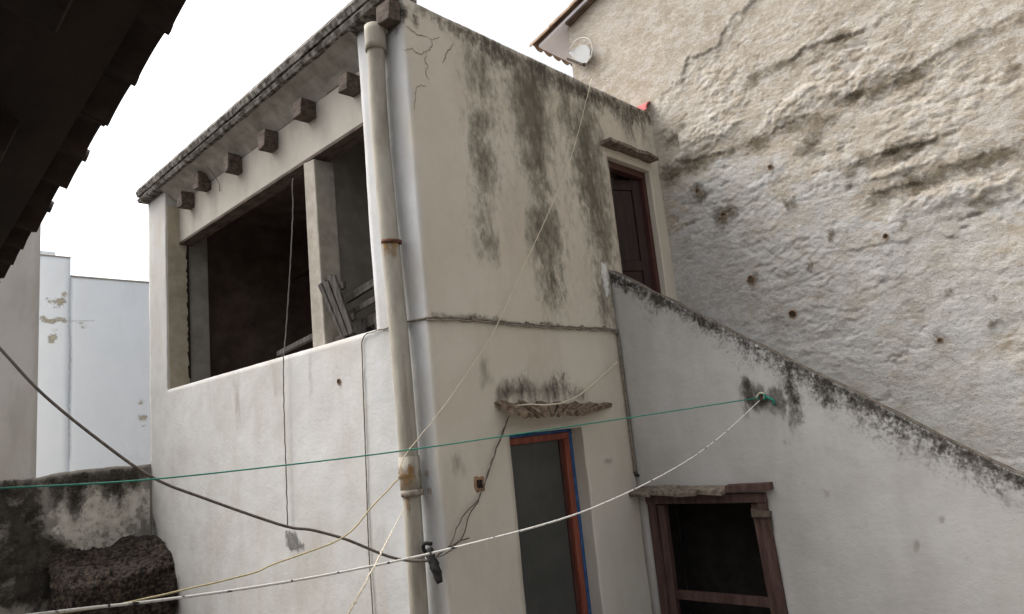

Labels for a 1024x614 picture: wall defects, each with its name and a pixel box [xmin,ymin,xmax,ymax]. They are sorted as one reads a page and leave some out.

crack [405,26,453,110]
leakage [438,18,650,258]
peeling [40,292,66,343]
mould [610,274,750,346]
mould [498,379,531,398]
mould [742,351,1024,484]
leakage [67,475,84,517]